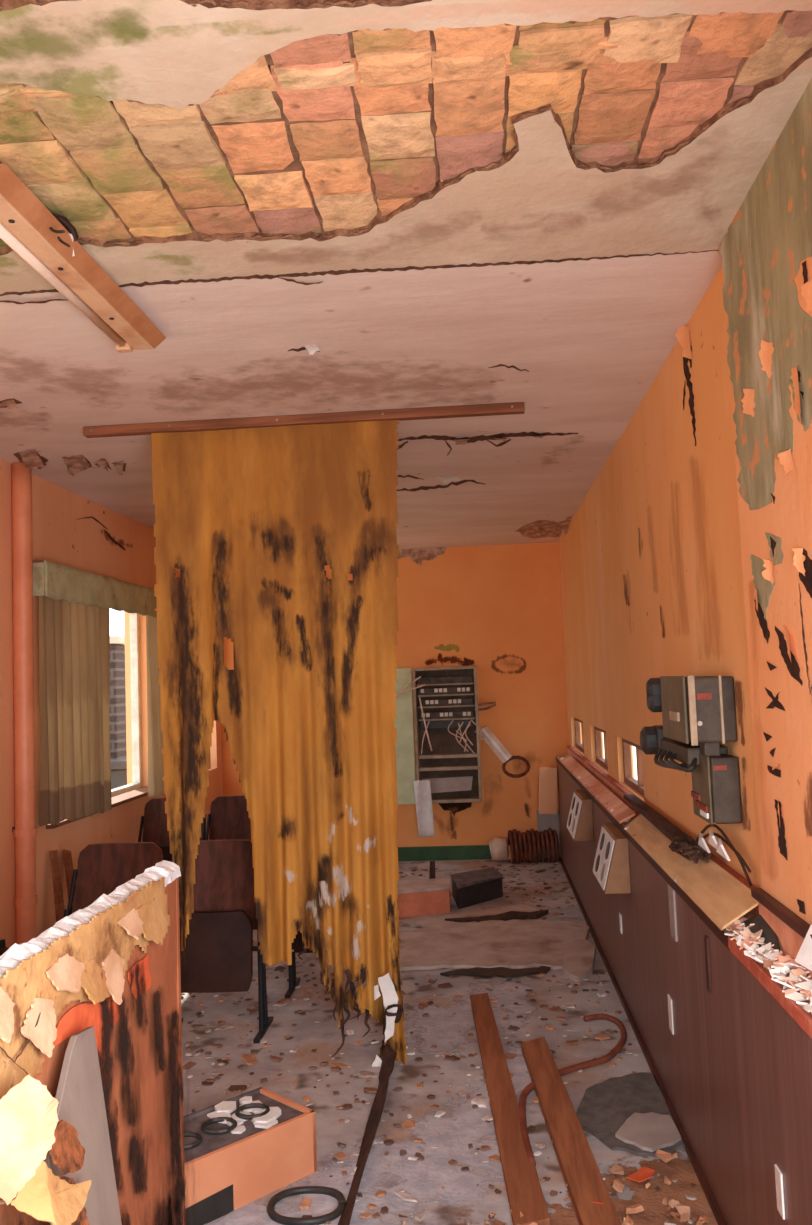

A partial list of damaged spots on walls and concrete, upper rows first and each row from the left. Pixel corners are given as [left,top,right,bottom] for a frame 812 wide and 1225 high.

flaking render [0,10,812,256]
crack [0,289,67,304]
crack [118,250,719,287]
peeling [719,78,812,510]
peeling [13,449,126,476]
crack [397,431,578,491]
crack [77,516,126,550]
peeling [750,532,812,701]
peeling [765,688,785,711]
peeling [763,732,781,777]
peeling [774,798,787,860]
flaking render [0,877,170,1225]